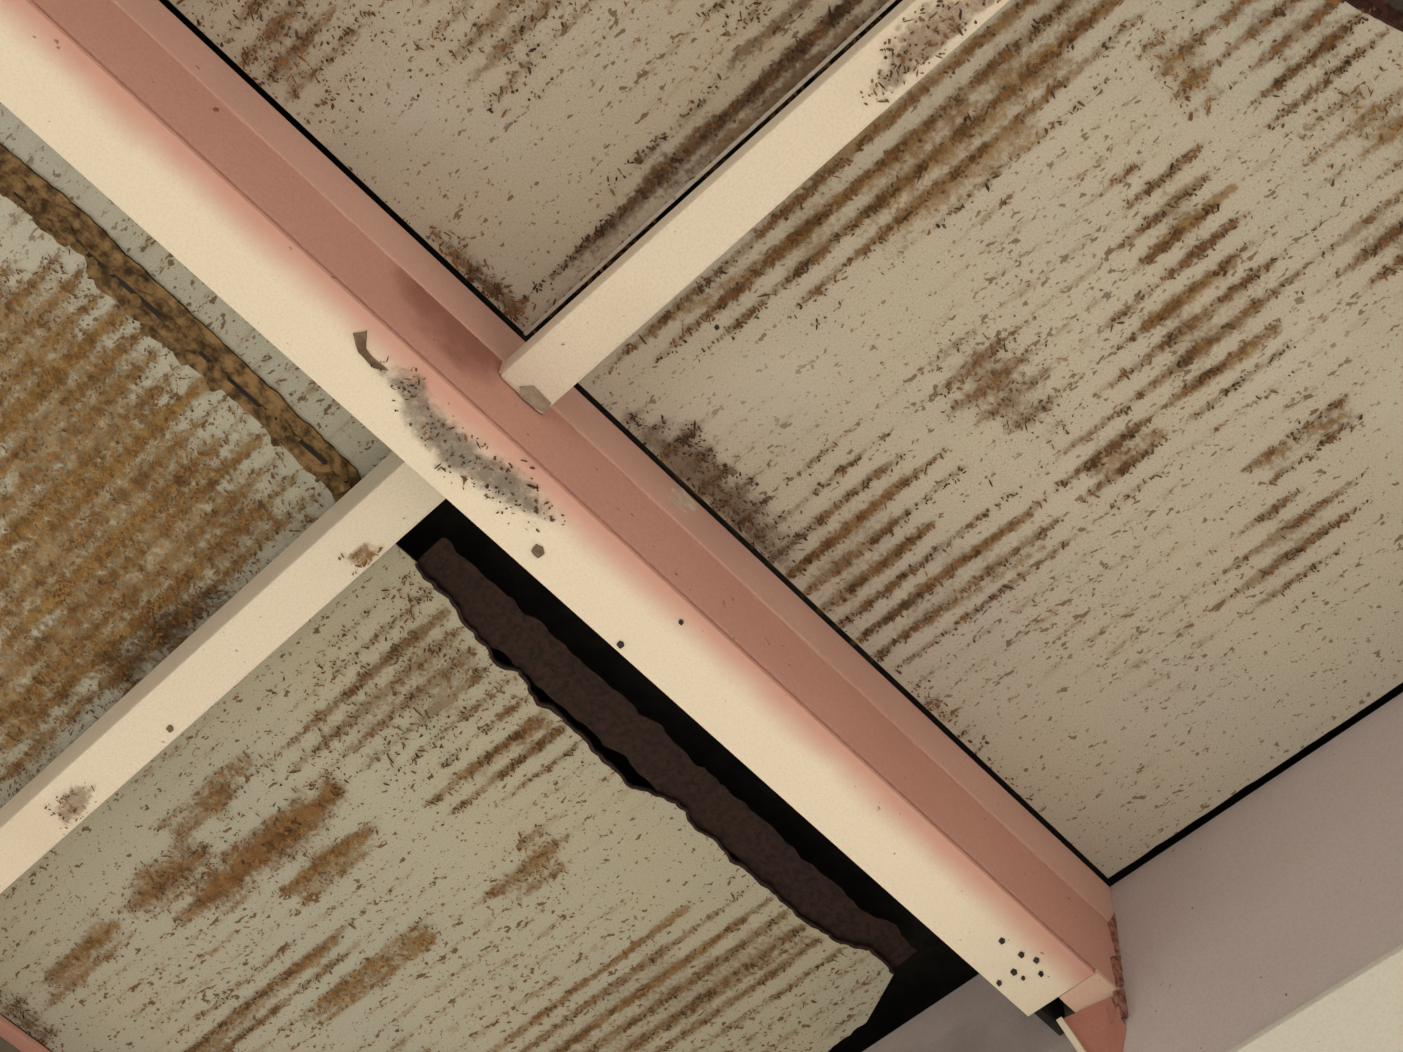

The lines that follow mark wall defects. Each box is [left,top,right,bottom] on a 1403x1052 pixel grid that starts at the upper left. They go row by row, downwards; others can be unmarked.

corrosion [176,0,592,146]
corrosion [426,0,900,334]
corrosion [609,0,1403,375]
corrosion [0,143,362,798]
corrosion [338,544,383,575]
peeling [531,544,545,558]
corrosion [624,143,1306,801]
corrosion [1214,394,1369,621]
corrosion [0,574,591,1052]
corrosion [494,877,855,1052]